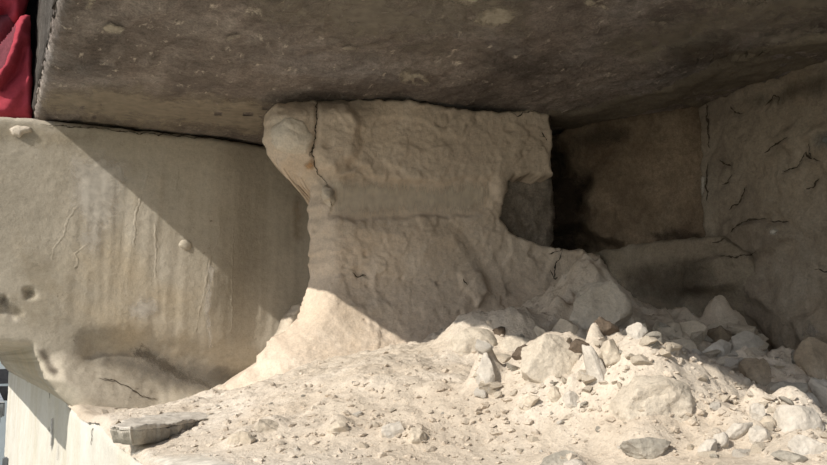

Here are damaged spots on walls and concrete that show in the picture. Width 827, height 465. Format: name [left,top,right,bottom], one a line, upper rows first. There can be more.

damp [51,161,125,269]
crack [309,102,327,183]
spalling [218,99,609,390]
crack [704,104,788,258]
crack [784,144,819,189]
damp [108,359,232,389]